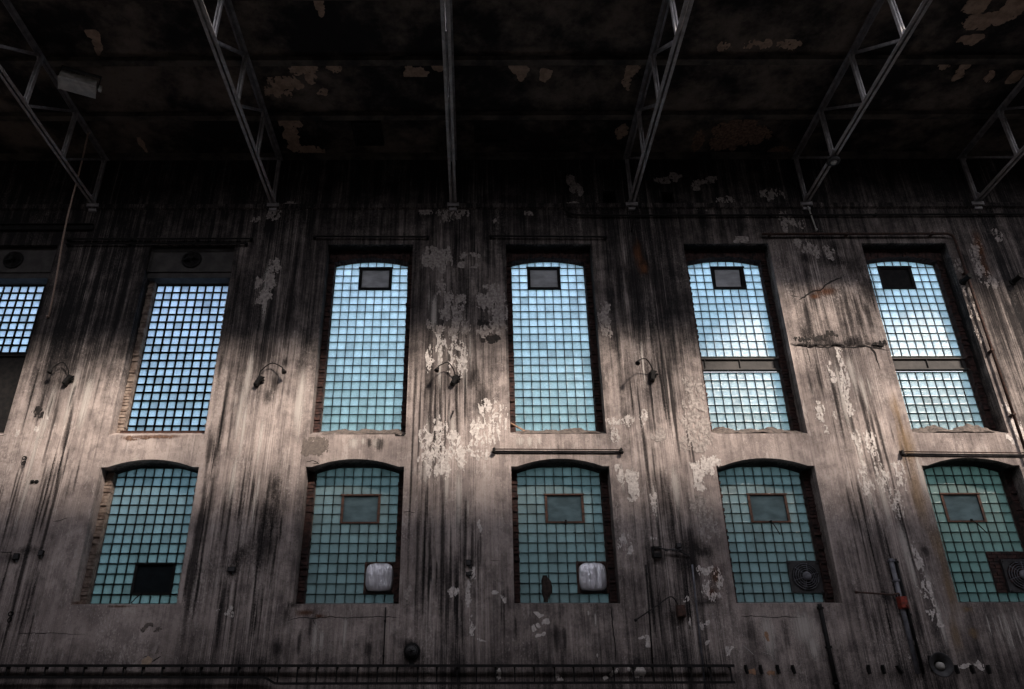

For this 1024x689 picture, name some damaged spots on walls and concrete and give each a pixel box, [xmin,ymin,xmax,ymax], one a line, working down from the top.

peeling [956,0,1024,46]
peeling [422,245,508,378]
crack [791,277,842,300]
peeling [954,238,1001,344]
water stain [180,357,282,644]
water stain [294,375,305,437]
peeling [395,398,510,480]
peeling [605,409,648,443]
peeling [615,464,657,516]
water stain [630,345,711,645]
peeling [678,375,722,542]
peeling [850,430,907,520]